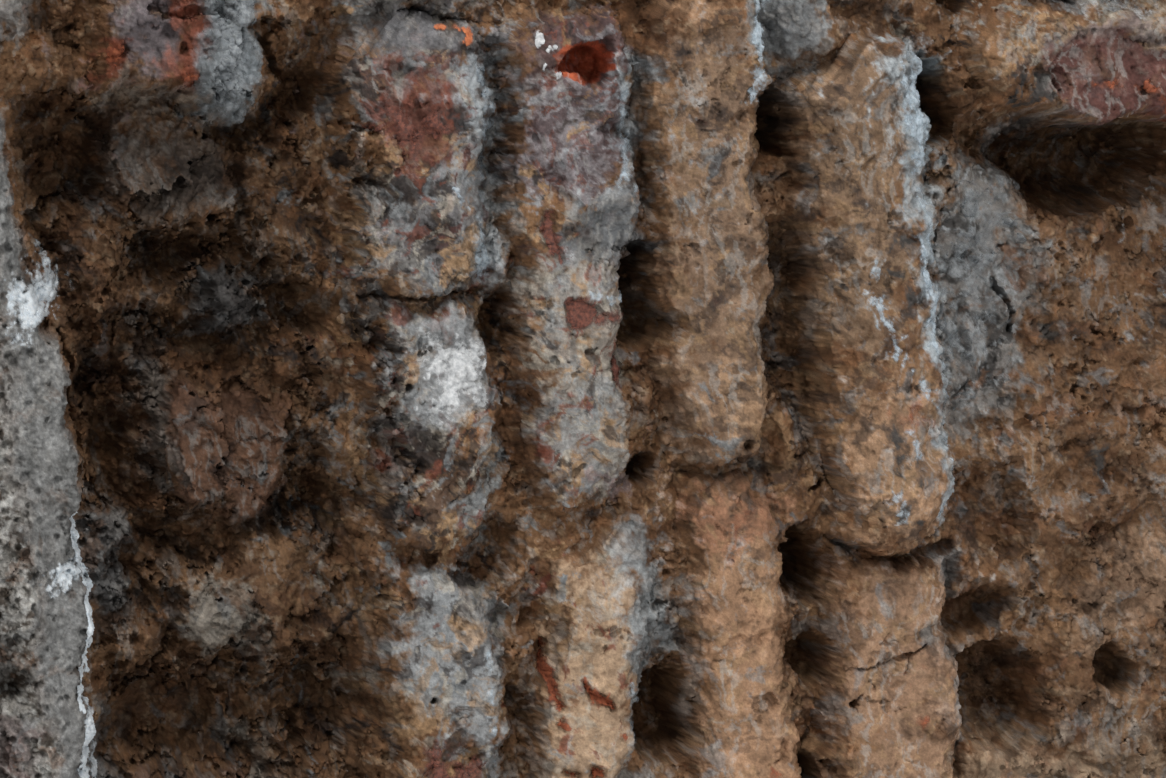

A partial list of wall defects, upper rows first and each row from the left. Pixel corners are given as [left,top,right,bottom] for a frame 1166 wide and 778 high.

spalling [549,32,620,93]